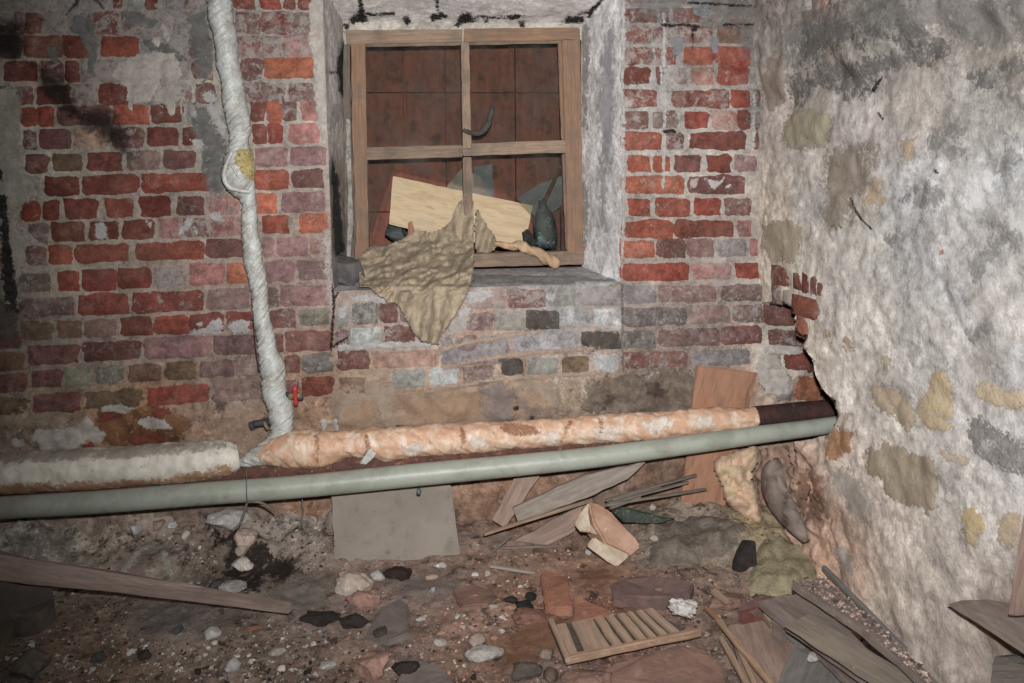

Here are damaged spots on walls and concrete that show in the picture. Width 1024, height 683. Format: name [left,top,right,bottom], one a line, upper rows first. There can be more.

crack [577,0,603,18]
flaking render [112,24,221,119]
water stain [69,109,127,152]
flaking render [823,329,855,352]
flaking render [756,345,807,397]